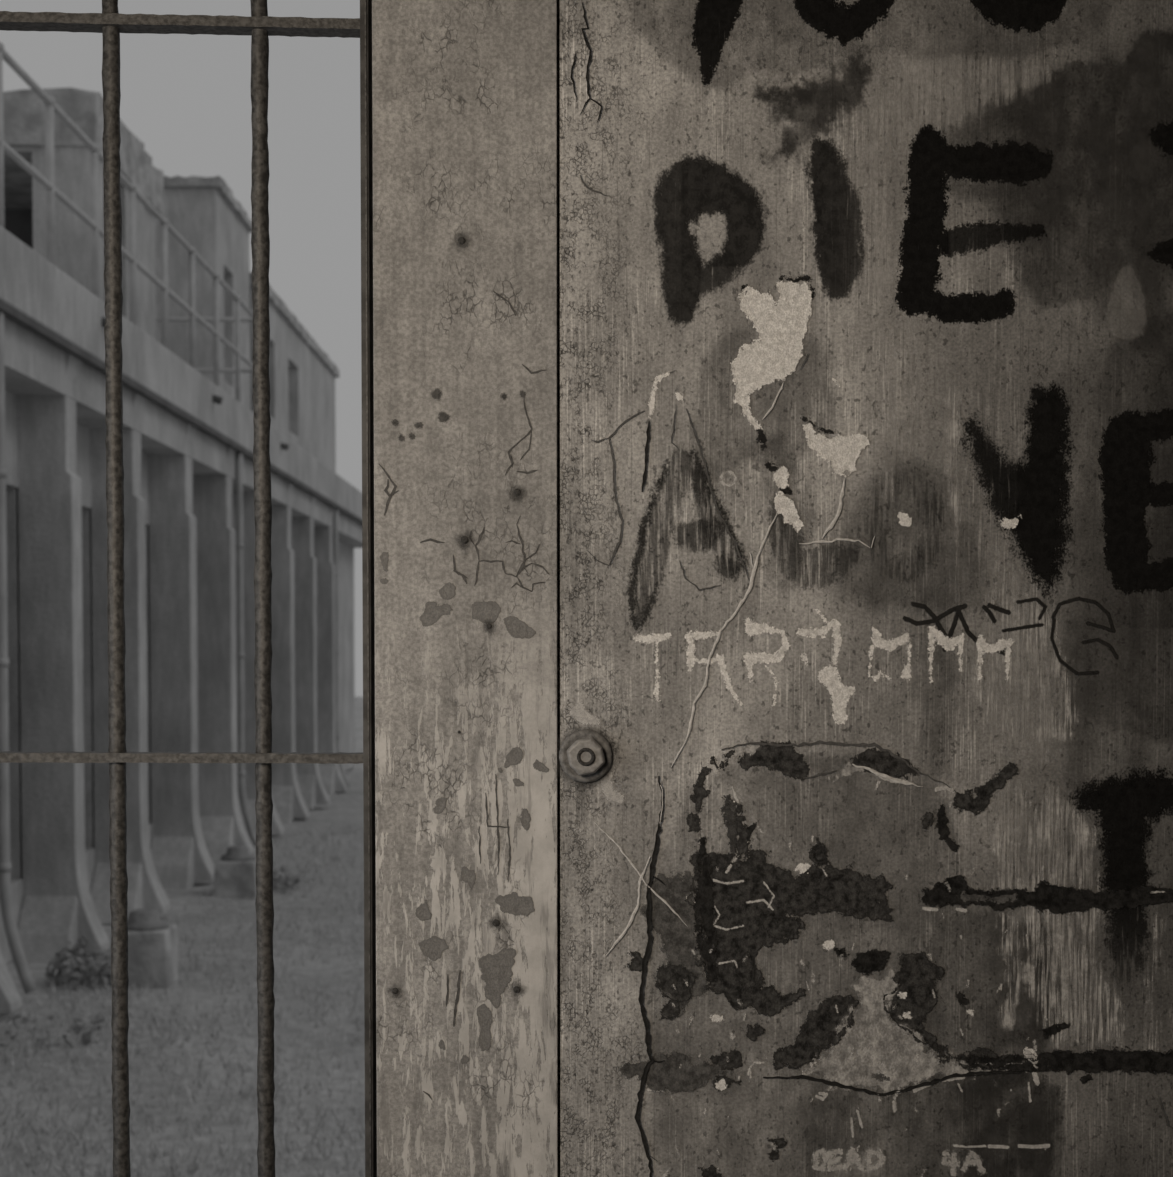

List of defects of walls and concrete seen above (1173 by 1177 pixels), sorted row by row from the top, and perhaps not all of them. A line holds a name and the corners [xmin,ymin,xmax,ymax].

damp [870,33,1173,295]
crack [505,401,537,475]
flaking render [730,275,816,533]
crack [762,353,809,420]
flaking render [800,417,870,478]
crack [799,478,875,548]
crack [420,515,549,592]
crack [721,740,950,788]
peeling [828,747,919,788]
peeling [921,762,1020,852]
peeling [619,786,1173,1112]
crack [763,1070,1048,1128]